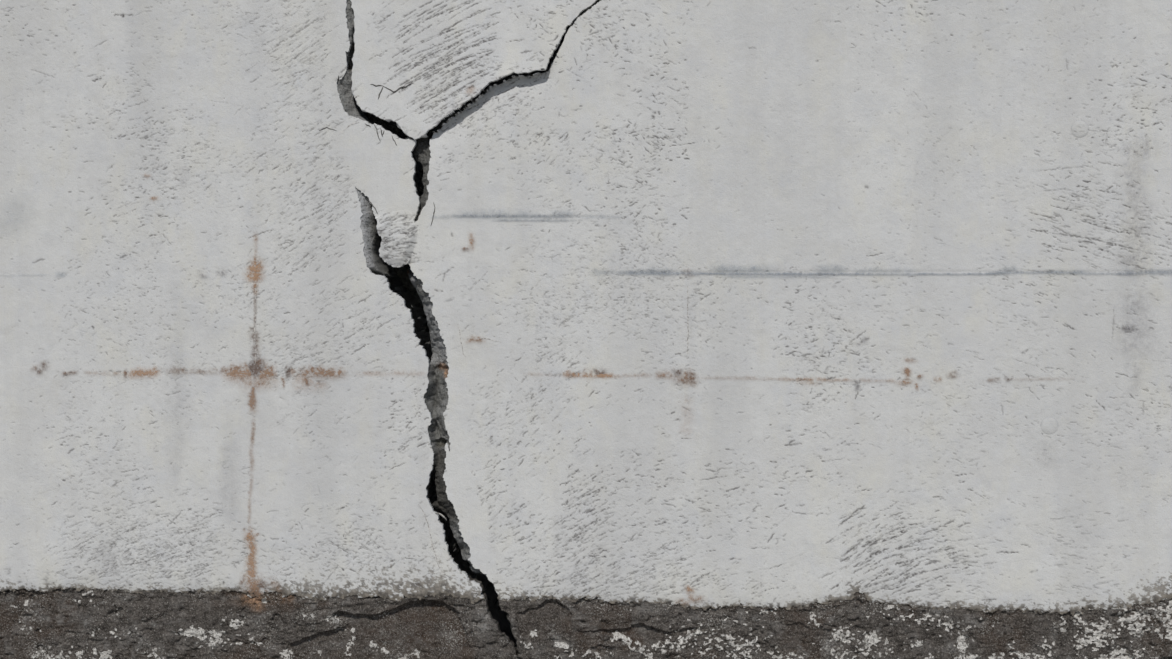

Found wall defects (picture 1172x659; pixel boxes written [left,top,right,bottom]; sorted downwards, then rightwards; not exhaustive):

crack [319,0,601,225]
corrosion [247,258,262,288]
corrosion [225,320,342,409]
crack [356,188,519,654]
corrosion [241,531,279,609]